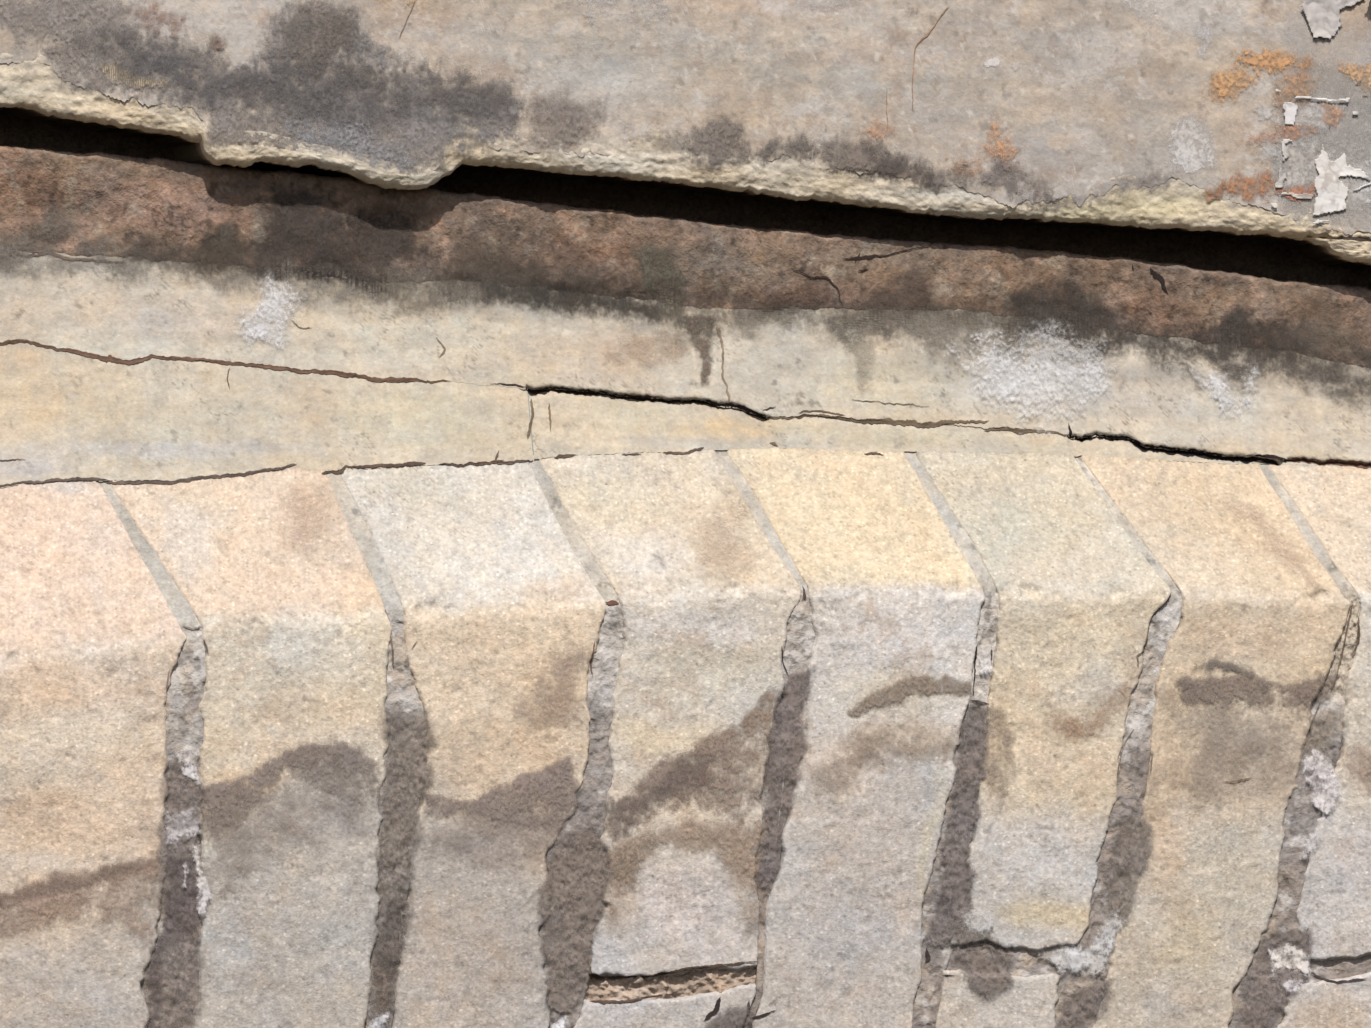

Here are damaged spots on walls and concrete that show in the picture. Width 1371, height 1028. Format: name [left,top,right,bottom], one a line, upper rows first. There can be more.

peeling [1301,0,1361,40]
damp [0,0,605,174]
rust [1209,48,1344,144]
rust [1338,62,1371,88]
rust [1203,171,1316,202]
crack [791,241,936,307]
crack [1132,264,1168,294]
crack [1342,235,1371,243]
crack [0,325,1371,487]
damp [1174,659,1371,859]
damp [0,665,815,1028]
damp [816,645,1013,1000]